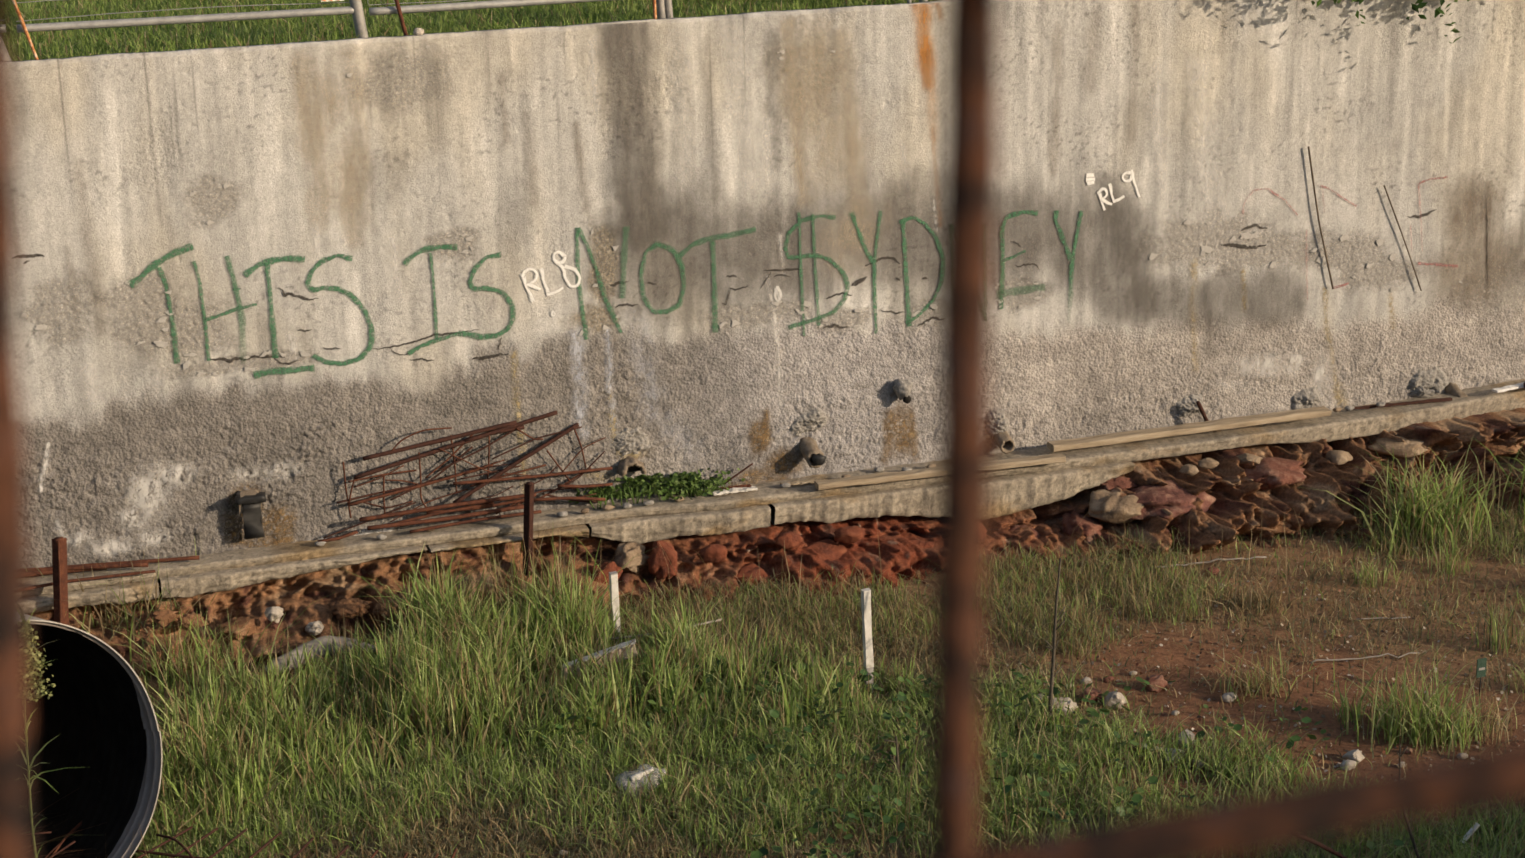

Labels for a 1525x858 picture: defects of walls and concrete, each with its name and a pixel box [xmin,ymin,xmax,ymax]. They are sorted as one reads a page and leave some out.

rust [915,3,931,69]
damp [606,22,824,385]
damp [844,186,943,272]
damp [992,201,1120,287]